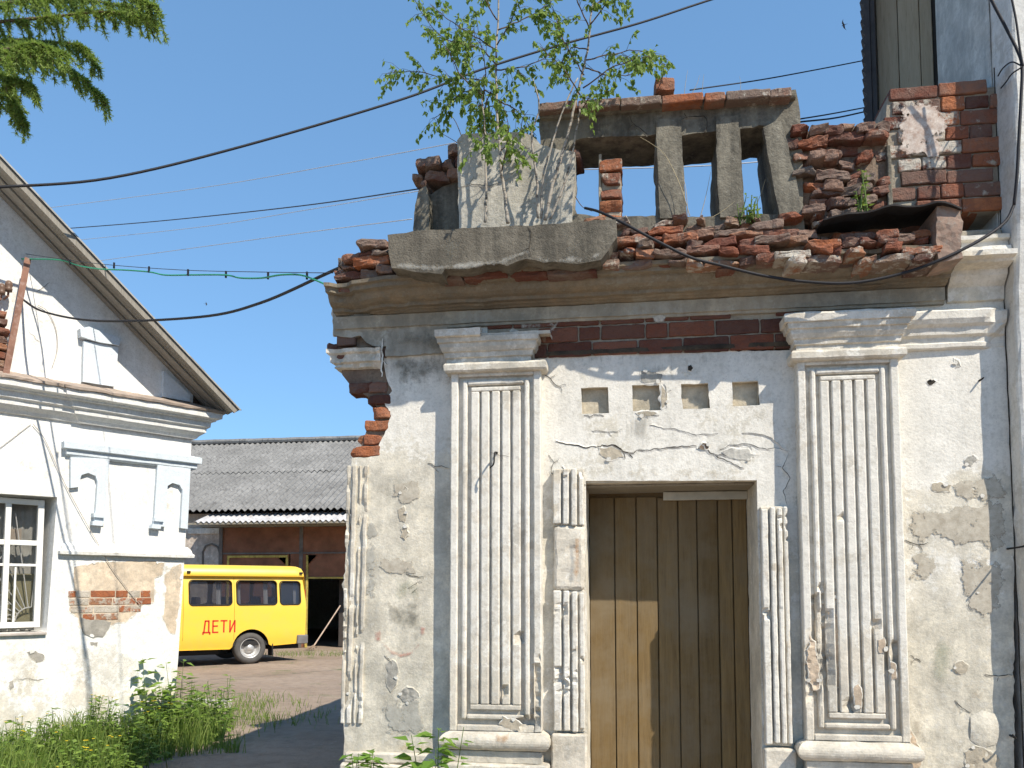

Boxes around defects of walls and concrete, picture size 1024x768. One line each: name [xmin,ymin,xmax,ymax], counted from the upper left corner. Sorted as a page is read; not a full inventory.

crack [548,384,790,505]
peeling [366,523,415,597]
peeling [393,481,420,540]
peeling [909,475,1006,617]
spalling [67,559,183,646]
peeling [383,659,424,734]
spalling [806,590,839,691]
spalling [852,684,863,709]
spalling [877,638,897,681]